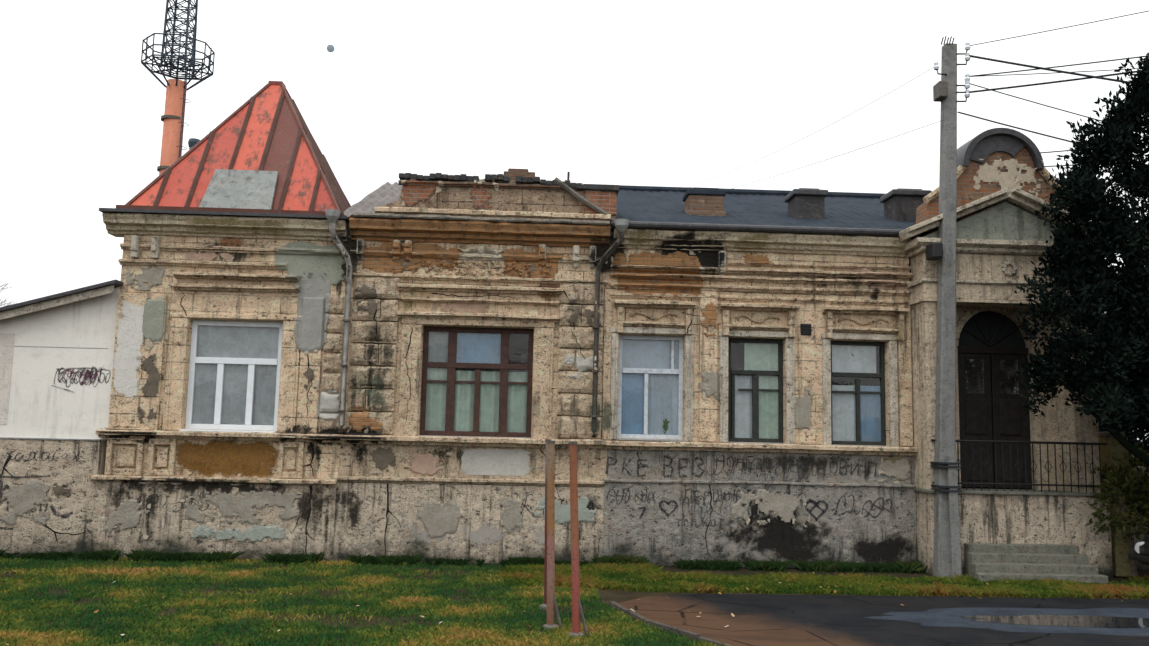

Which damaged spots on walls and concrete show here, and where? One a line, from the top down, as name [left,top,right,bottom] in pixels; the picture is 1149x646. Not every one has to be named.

peeling [973,159,1044,197]
flaking render [611,250,719,338]
spalling [136,339,164,425]
damp [112,477,286,540]
damp [298,489,361,541]
damp [749,503,797,538]